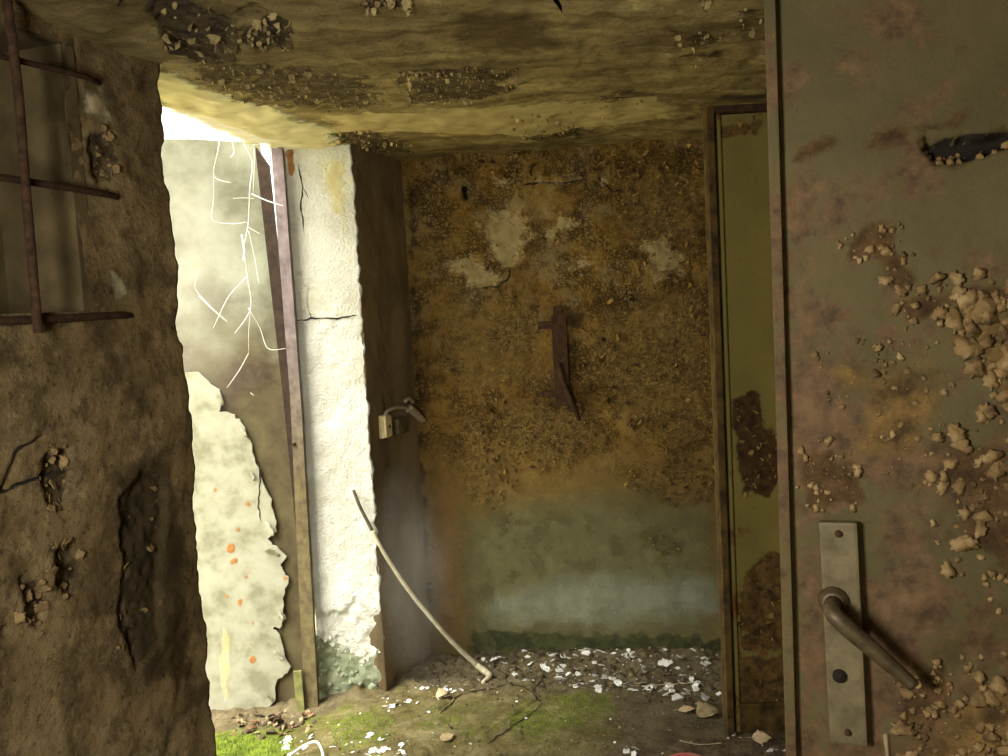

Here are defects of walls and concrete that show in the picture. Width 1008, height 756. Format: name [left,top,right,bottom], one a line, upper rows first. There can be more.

spalling [359,0,415,17]
flaking render [145,0,390,113]
flaking render [392,67,520,108]
crack [297,287,358,321]
crack [0,435,70,494]
water stain [497,581,714,620]